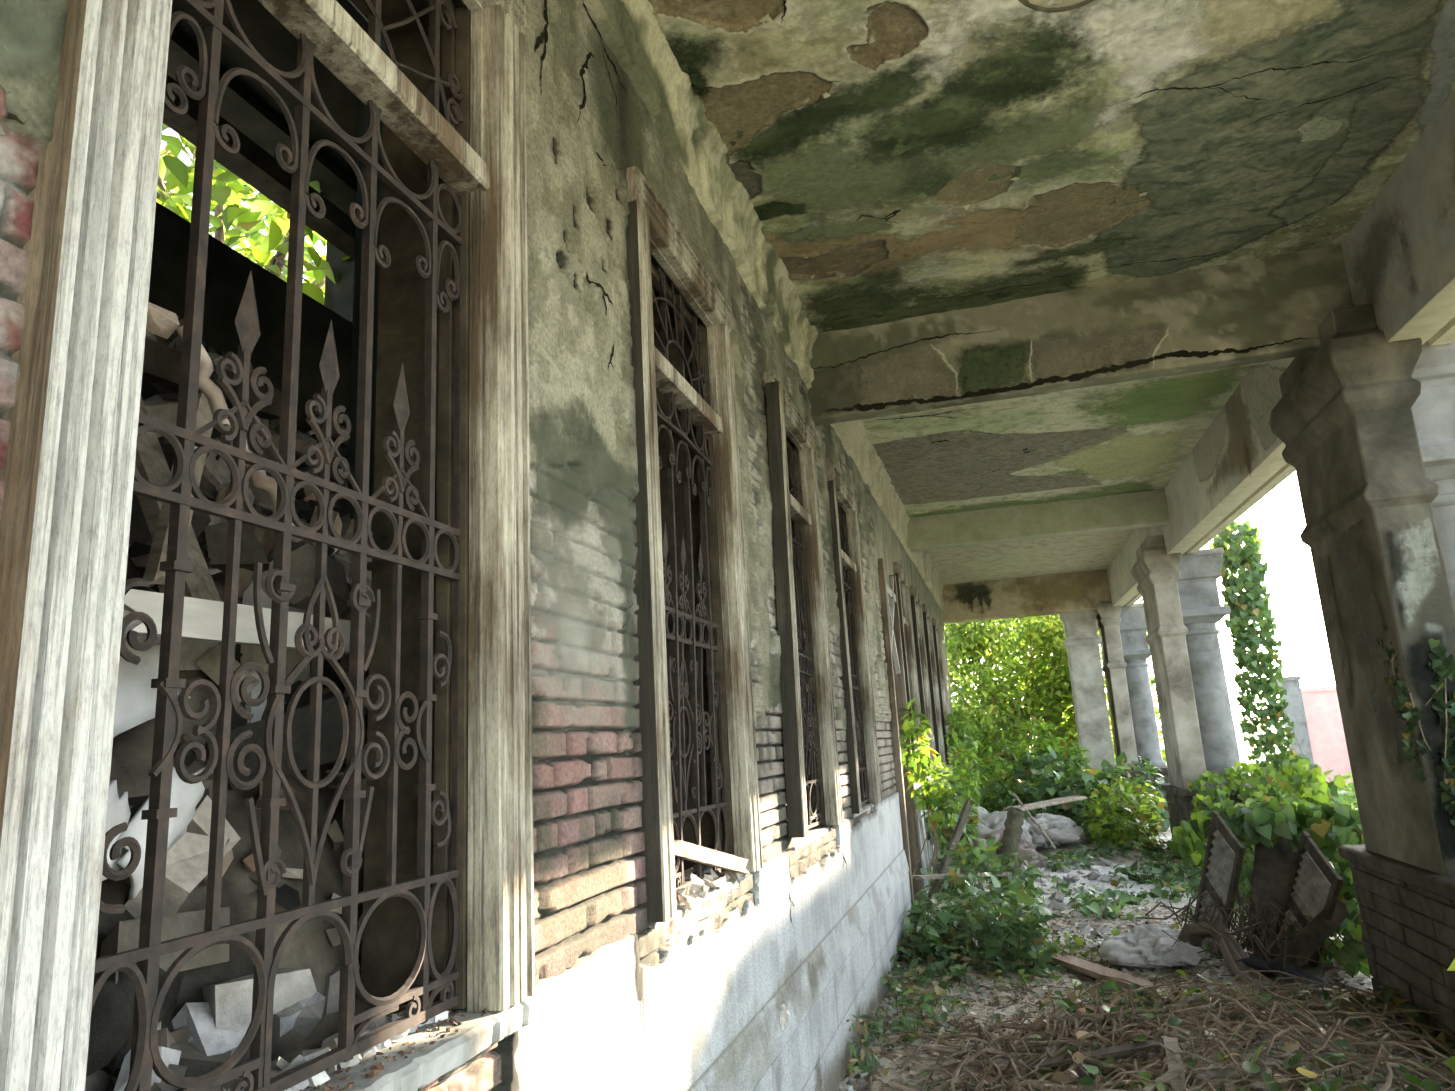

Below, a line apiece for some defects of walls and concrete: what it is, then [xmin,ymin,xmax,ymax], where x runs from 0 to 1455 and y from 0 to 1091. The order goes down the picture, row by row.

crack [535,0,549,95]
crack [577,3,628,122]
water stain [666,33,723,96]
flaking render [648,0,784,32]
flaking render [692,71,841,164]
flaking render [847,1,928,70]
crack [1117,47,1417,128]
water stain [729,0,1442,332]
crack [812,327,1318,420]
water stain [1321,522,1398,774]
water stain [1389,520,1455,858]
flaking render [417,1043,501,1091]